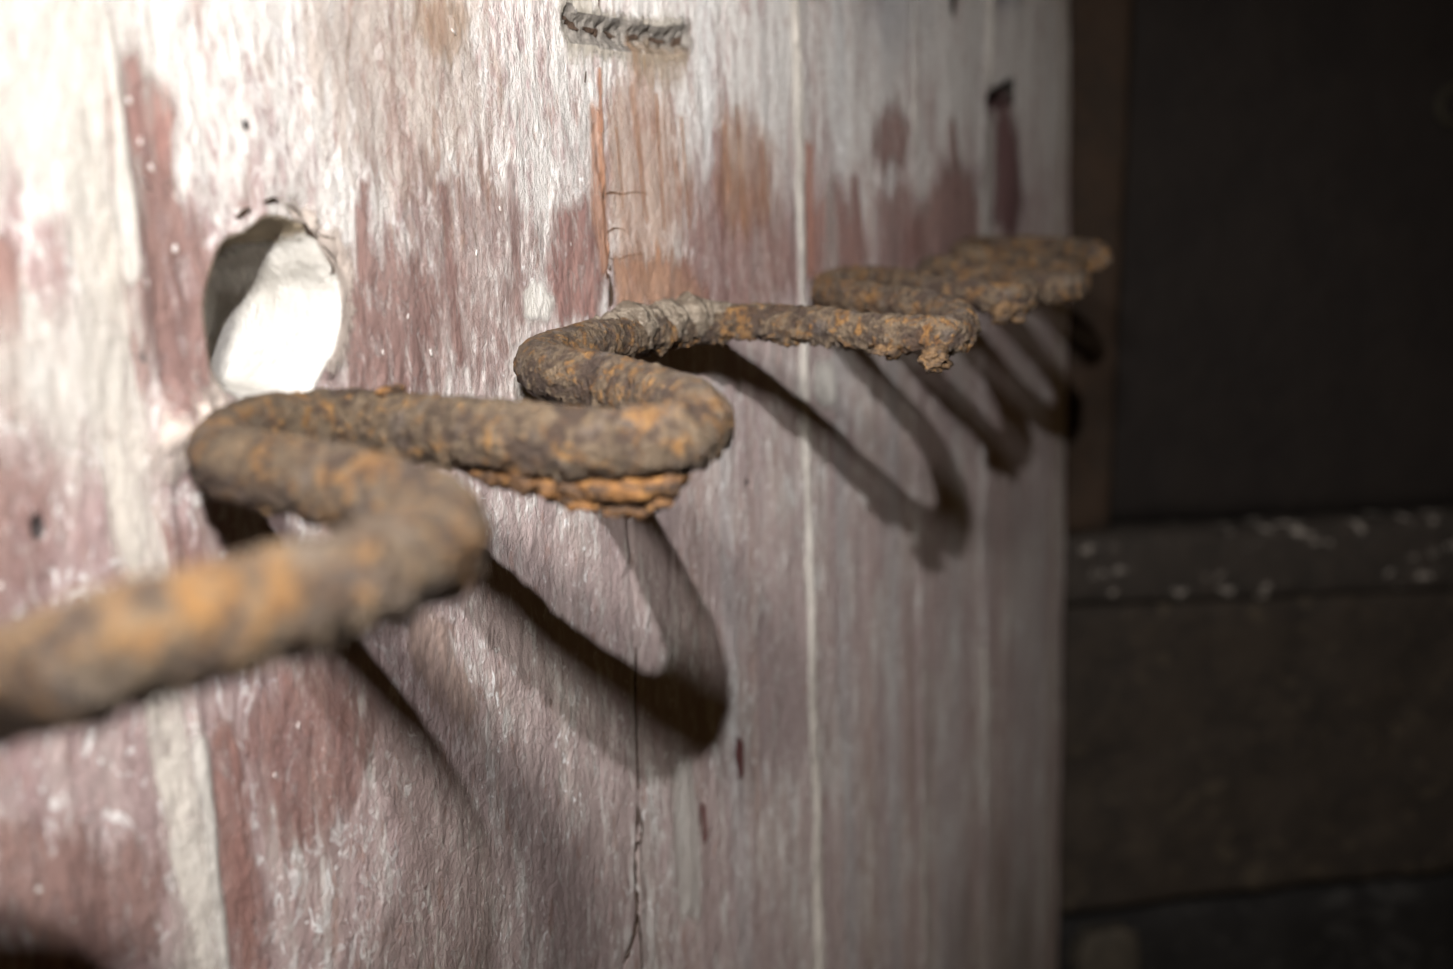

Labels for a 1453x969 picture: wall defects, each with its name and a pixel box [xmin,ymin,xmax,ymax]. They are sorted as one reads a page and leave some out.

spalling [100,49,463,482]
rust [374,384,406,398]
crack [623,648,643,969]
rust [735,736,744,779]